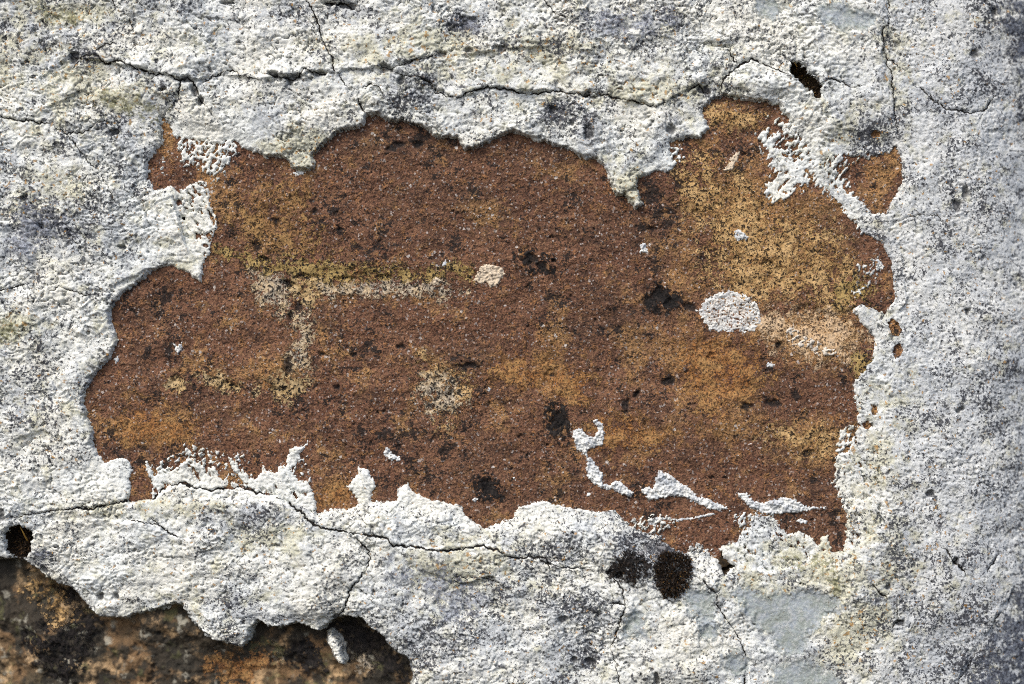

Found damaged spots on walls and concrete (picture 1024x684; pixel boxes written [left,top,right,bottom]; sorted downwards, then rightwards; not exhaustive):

crack [70,0,788,117]
spalling [84,96,904,559]
spalling [0,558,413,684]
crack [9,482,626,684]
crack [694,576,747,684]